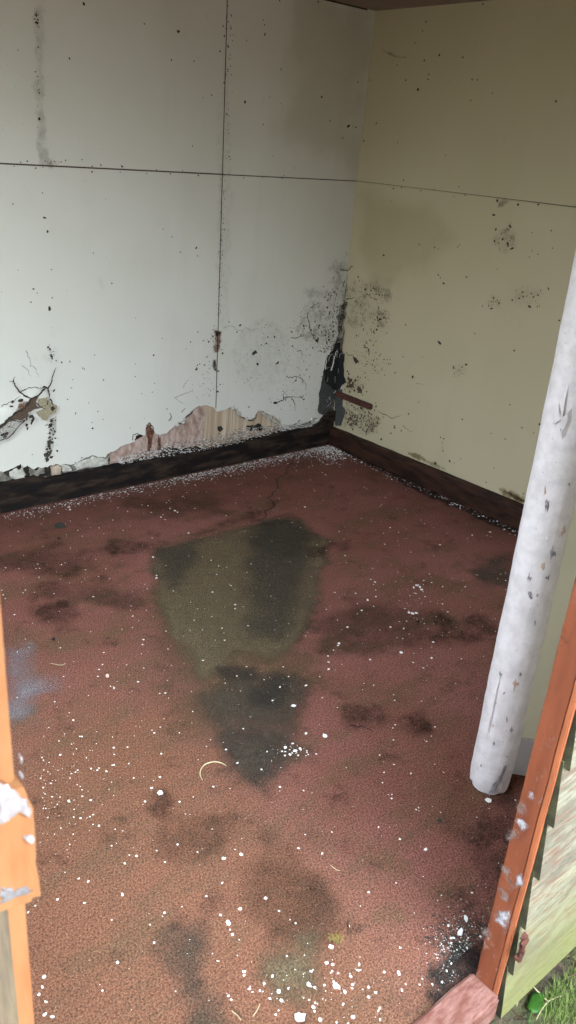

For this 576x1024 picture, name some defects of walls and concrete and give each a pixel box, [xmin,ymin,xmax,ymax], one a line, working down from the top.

leakage [229,265,404,440]
peeling [0,405,320,482]
leakage [151,519,329,784]